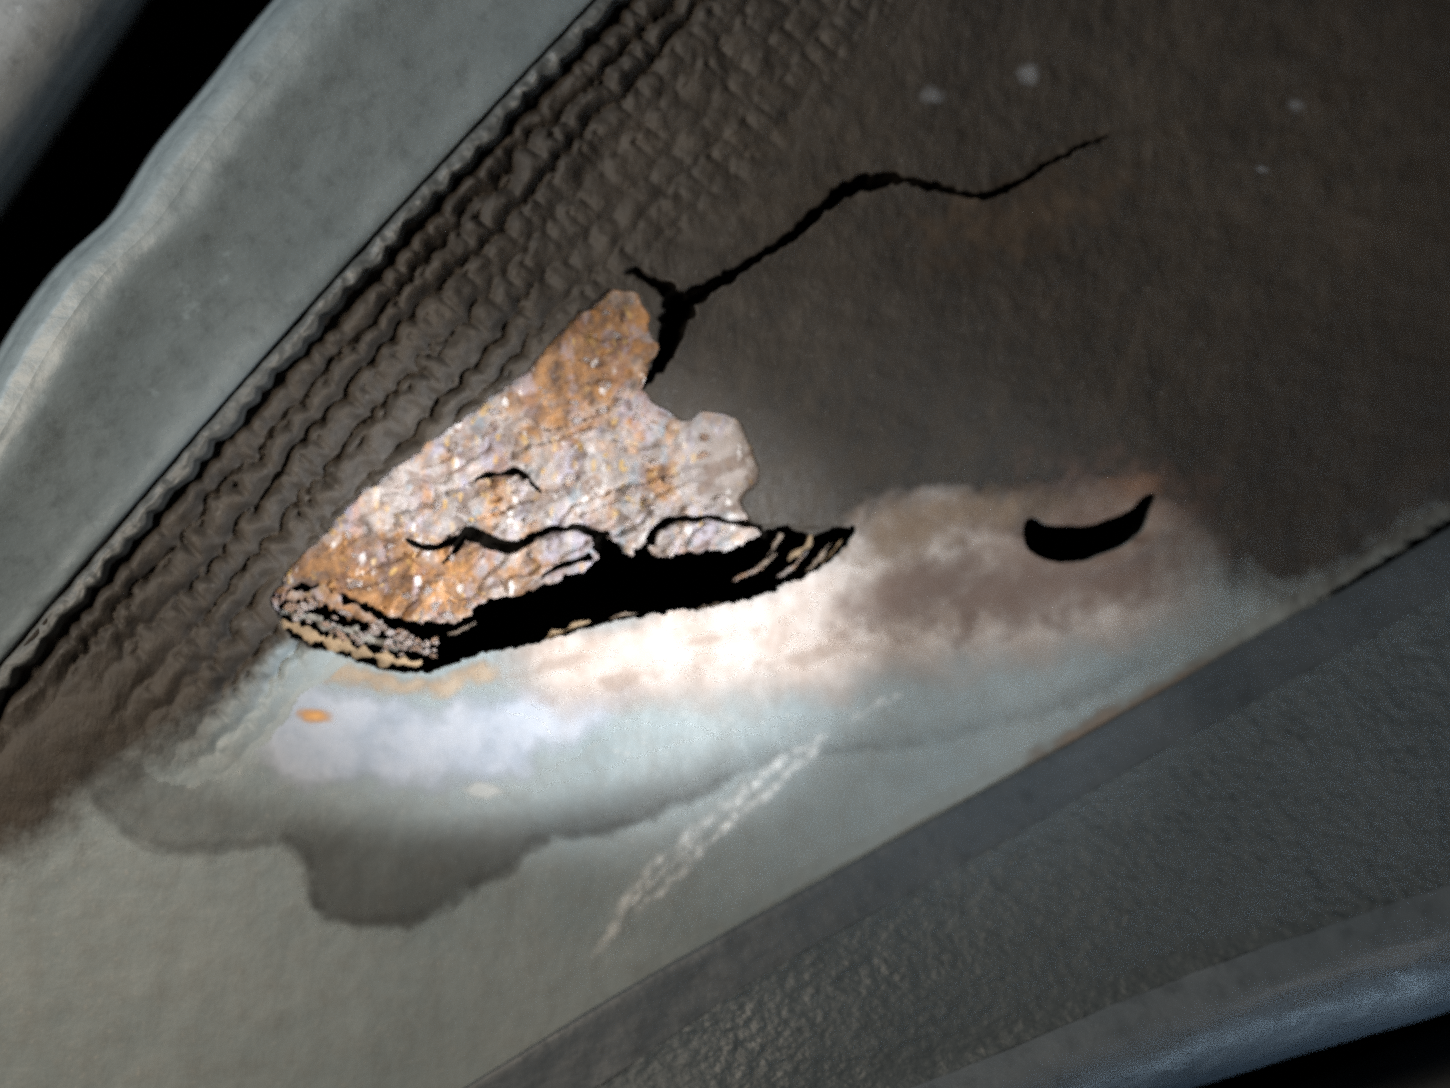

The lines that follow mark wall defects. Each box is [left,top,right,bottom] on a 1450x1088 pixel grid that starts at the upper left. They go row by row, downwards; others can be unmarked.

peeling [0,0,921,776]
corrosion [271,290,760,624]
crack [626,133,1113,389]
efflorescence [267,687,610,798]
leakage [605,749,816,939]